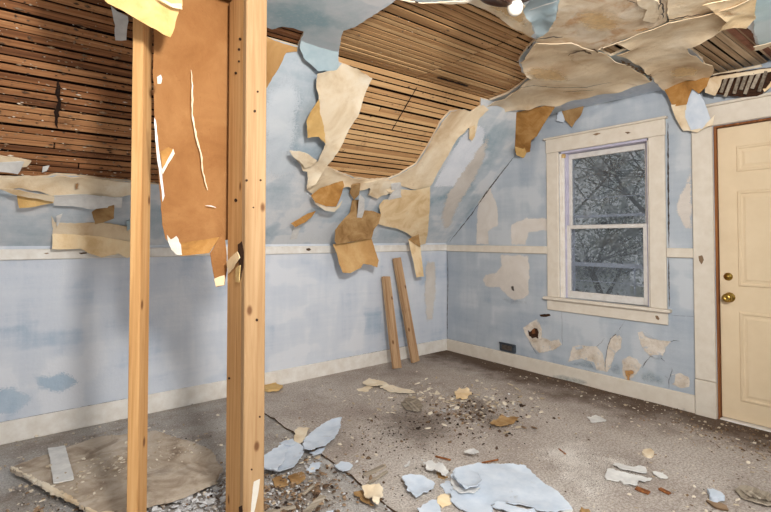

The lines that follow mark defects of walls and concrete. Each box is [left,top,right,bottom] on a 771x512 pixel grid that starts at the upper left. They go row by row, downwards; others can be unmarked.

flaking render [402,0,756,50]
flaking render [266,37,298,88]
peeling [290,64,489,194]
flaking render [0,175,131,241]
peeling [523,314,562,353]
peeling [568,330,642,380]
peeling [637,331,670,358]